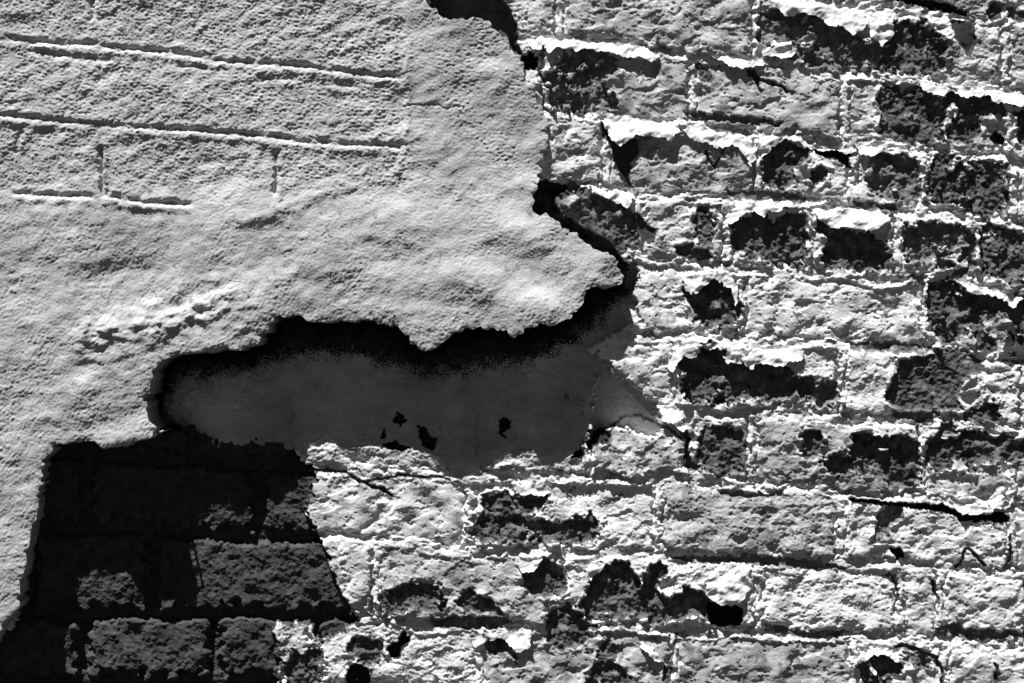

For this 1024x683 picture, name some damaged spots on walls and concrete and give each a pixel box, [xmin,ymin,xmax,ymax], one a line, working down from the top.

spalling [668,0,1024,561]
flaking render [0,34,680,683]
crack [309,467,451,498]
spalling [518,557,751,652]
spalling [856,647,931,683]